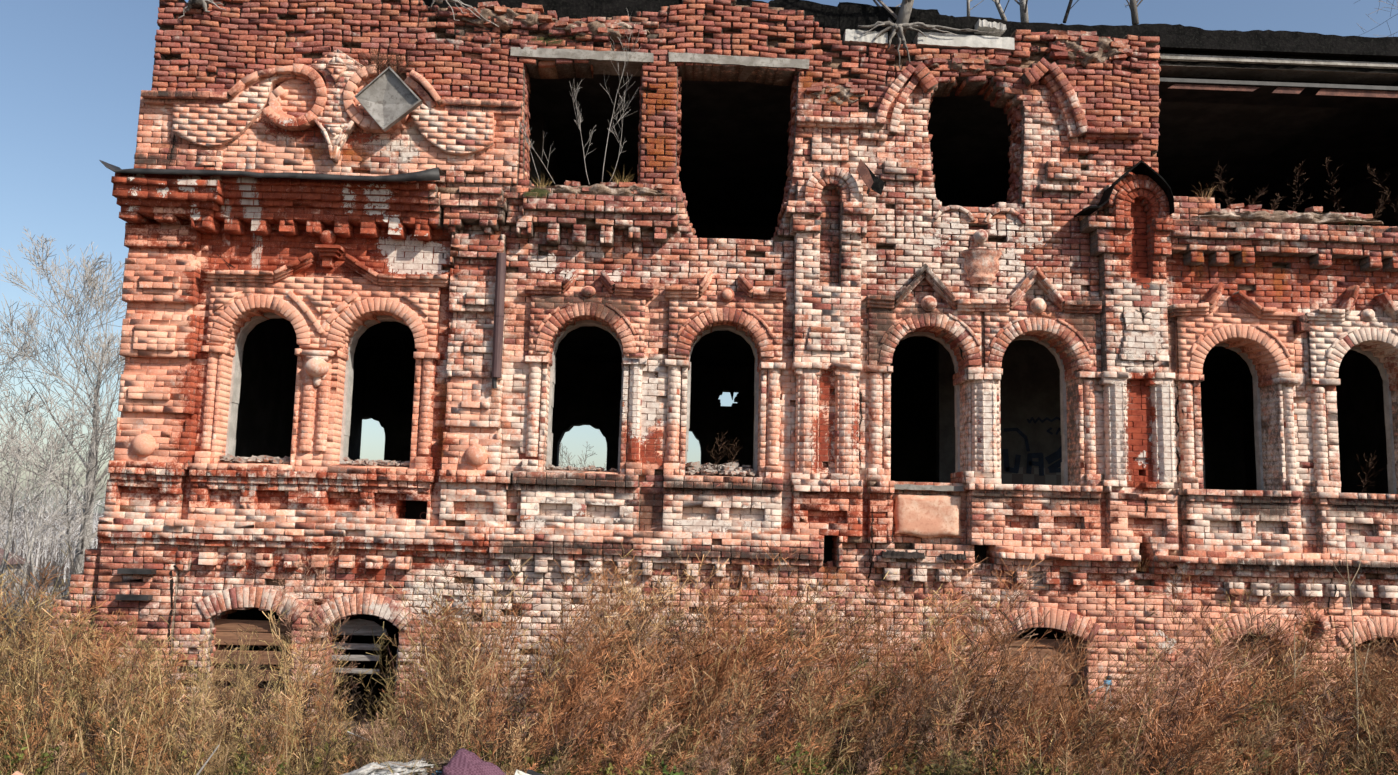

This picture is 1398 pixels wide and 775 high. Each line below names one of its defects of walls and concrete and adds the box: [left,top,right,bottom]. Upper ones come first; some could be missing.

damp [201,176,450,292]
peeling [621,362,665,467]
peeling [810,366,862,474]
peeling [1108,308,1177,485]